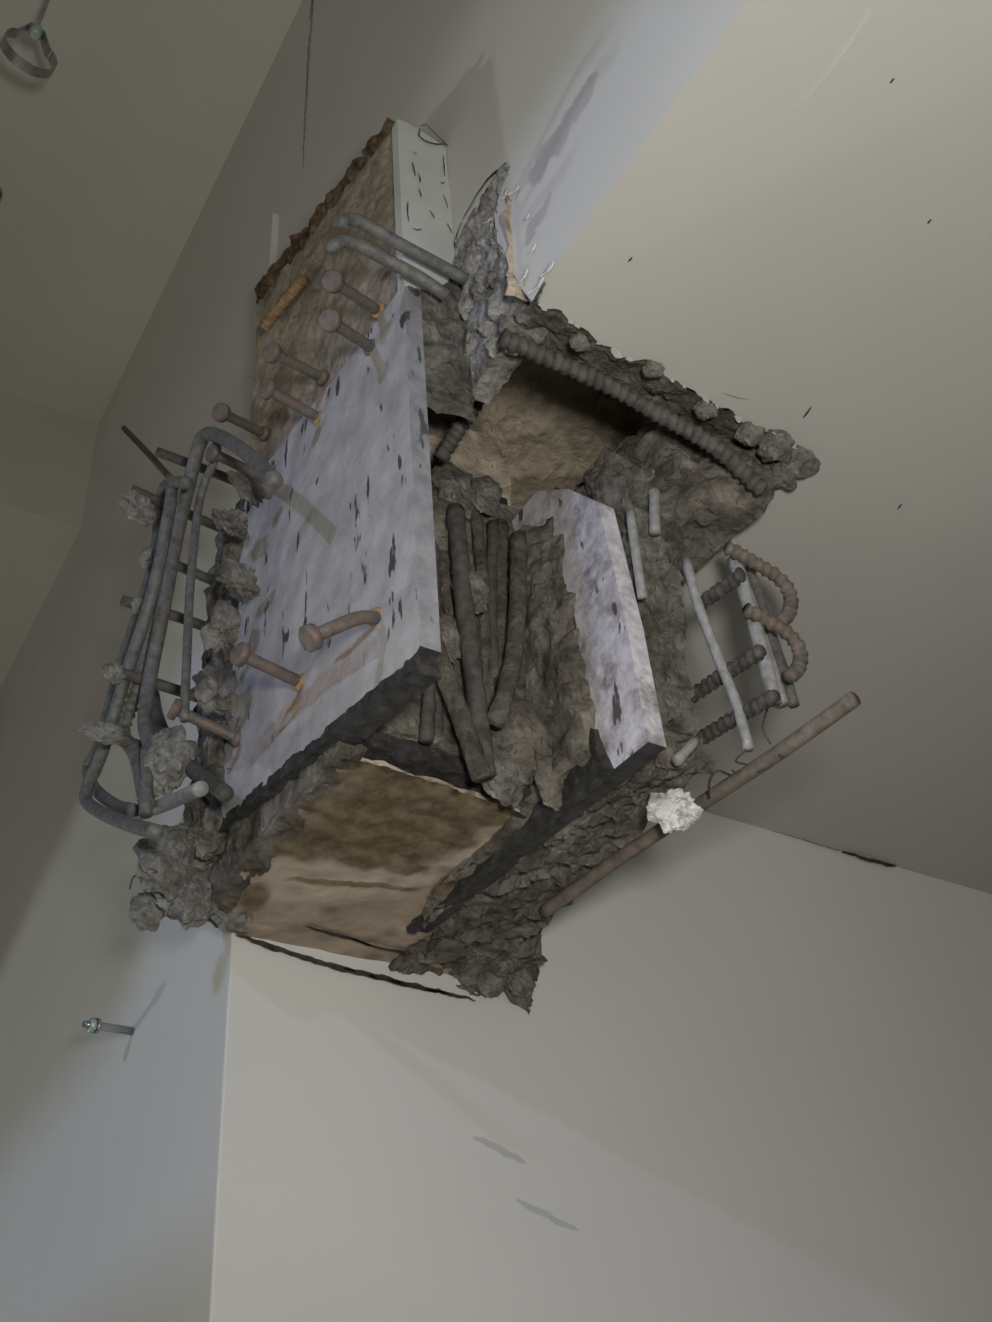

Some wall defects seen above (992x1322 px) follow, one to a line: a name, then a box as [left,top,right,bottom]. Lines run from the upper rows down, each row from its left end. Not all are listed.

spalling [326,151,821,495]
spalling [79,426,284,840]
spalling [419,487,528,783]
spalling [626,469,661,601]
spalling [672,556,861,812]
spalling [449,823,670,1014]